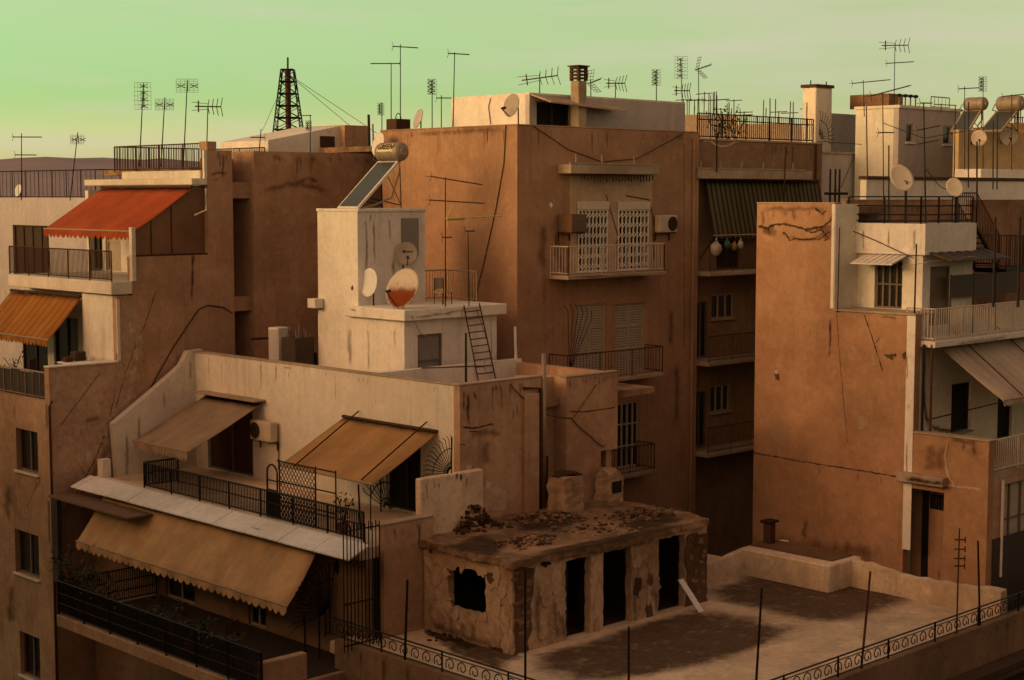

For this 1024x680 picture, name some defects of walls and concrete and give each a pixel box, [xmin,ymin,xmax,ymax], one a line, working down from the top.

crack [759,208,832,241]
crack [754,452,896,477]
flaking render [440,560,494,623]